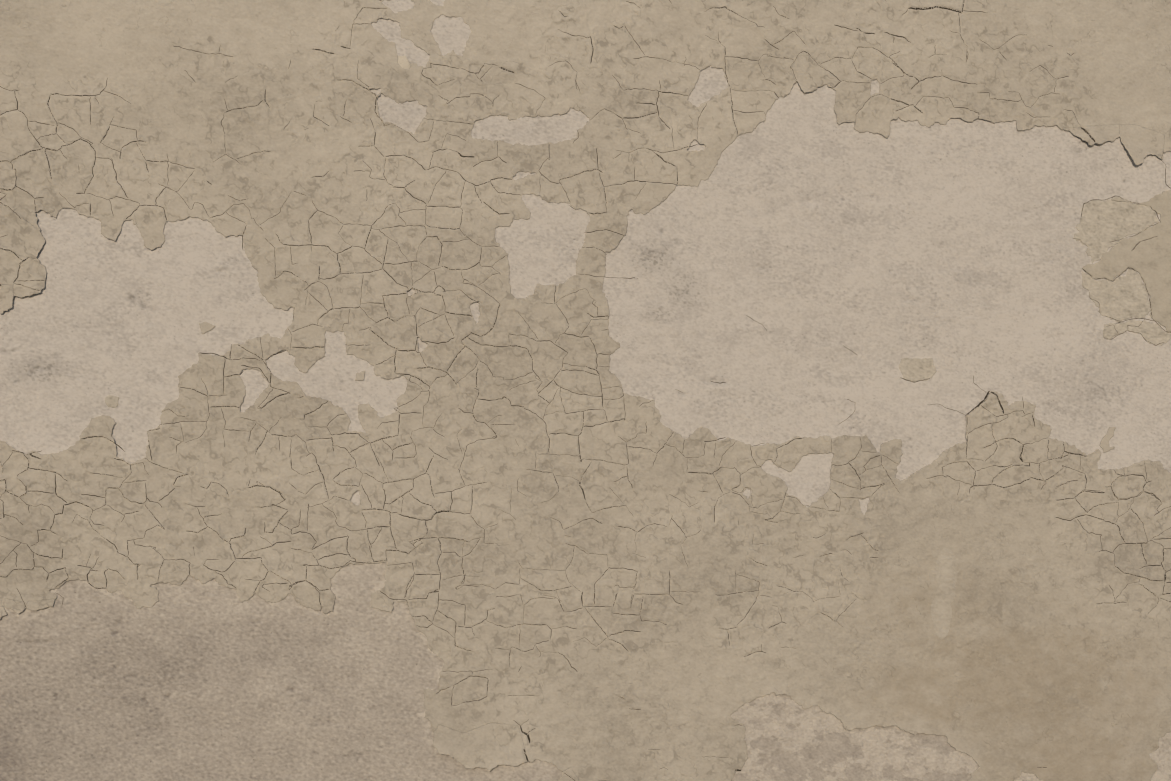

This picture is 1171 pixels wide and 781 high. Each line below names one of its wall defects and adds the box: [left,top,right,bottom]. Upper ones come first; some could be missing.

peeling [371,0,471,70]
peeling [471,108,589,146]
crack [705,0,1095,142]
peeling [0,203,408,464]
crack [0,0,900,761]
peeling [495,194,590,299]
peeling [602,55,1171,481]
crack [1074,158,1170,346]
peeling [761,452,834,508]
crack [902,376,1171,608]
peeling [1150,732,1171,781]